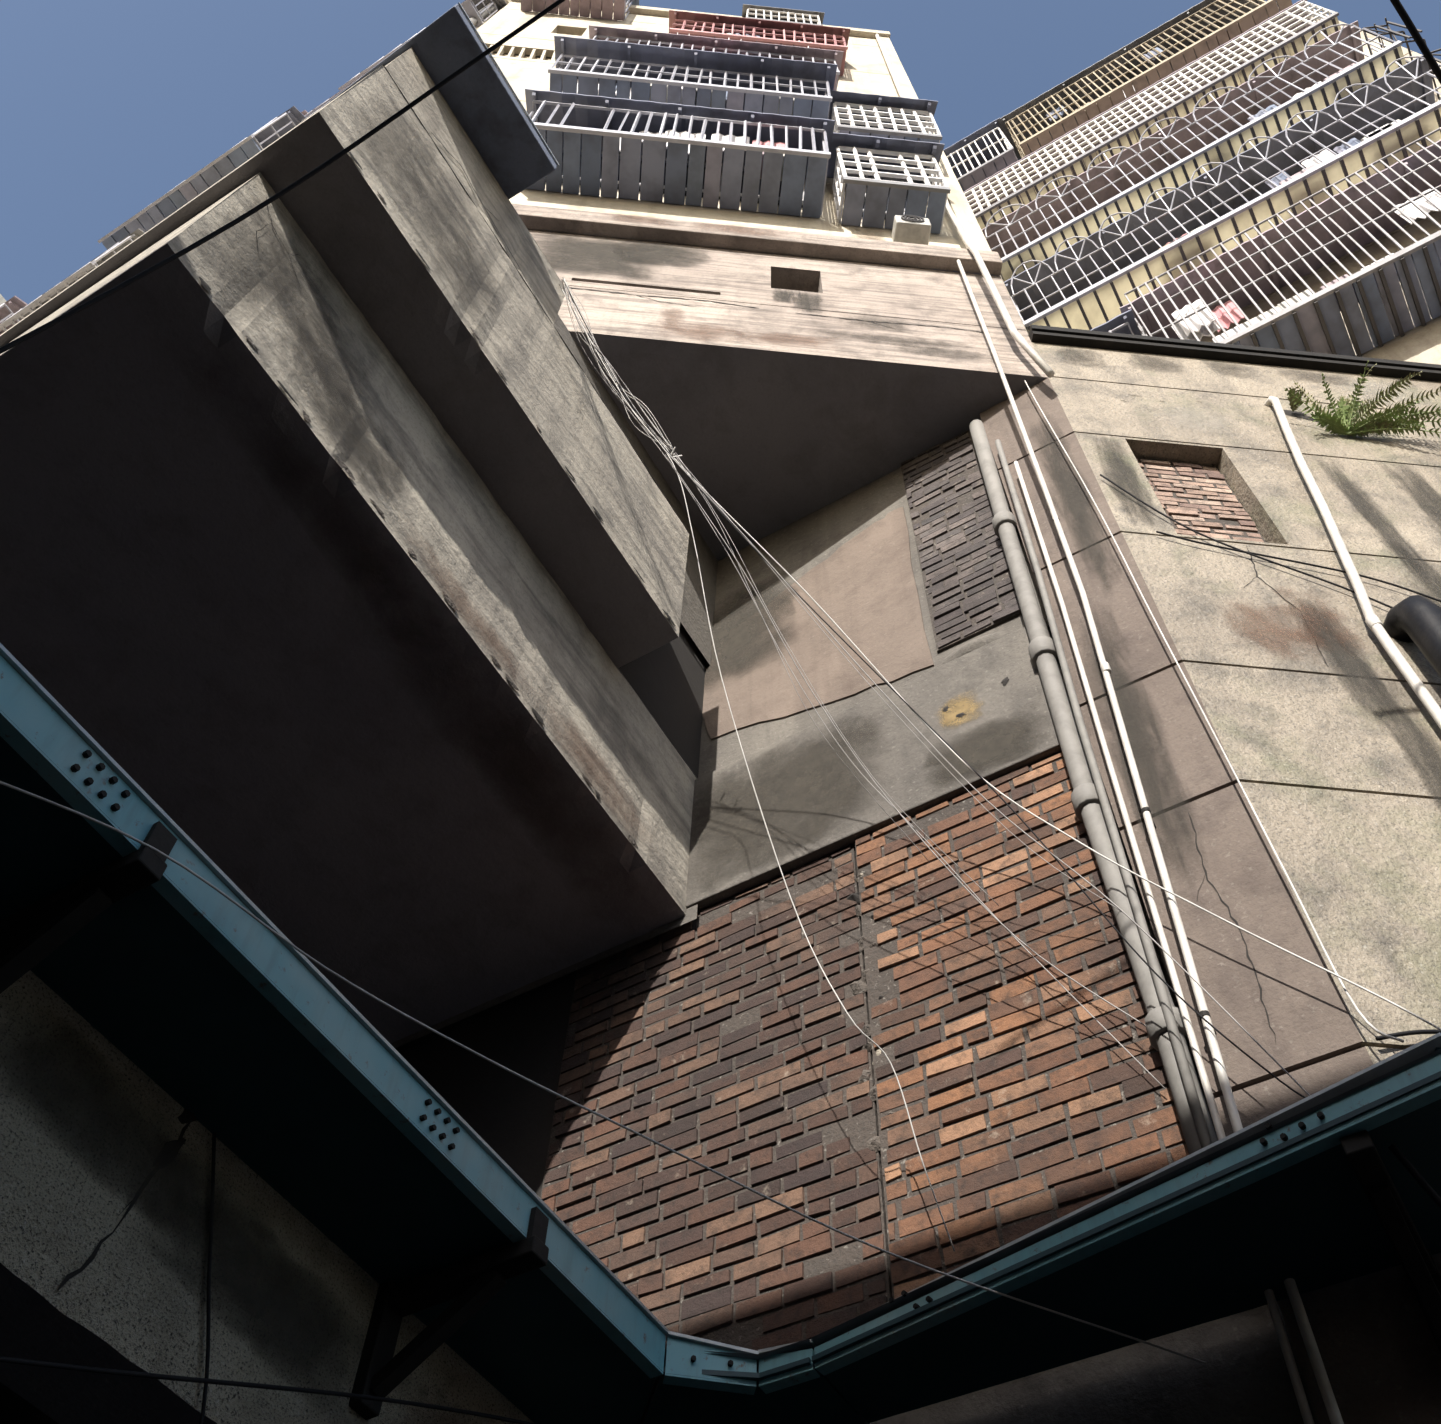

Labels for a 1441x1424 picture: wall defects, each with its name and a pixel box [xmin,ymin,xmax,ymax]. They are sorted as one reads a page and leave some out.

crack [1188,812,1276,1042]